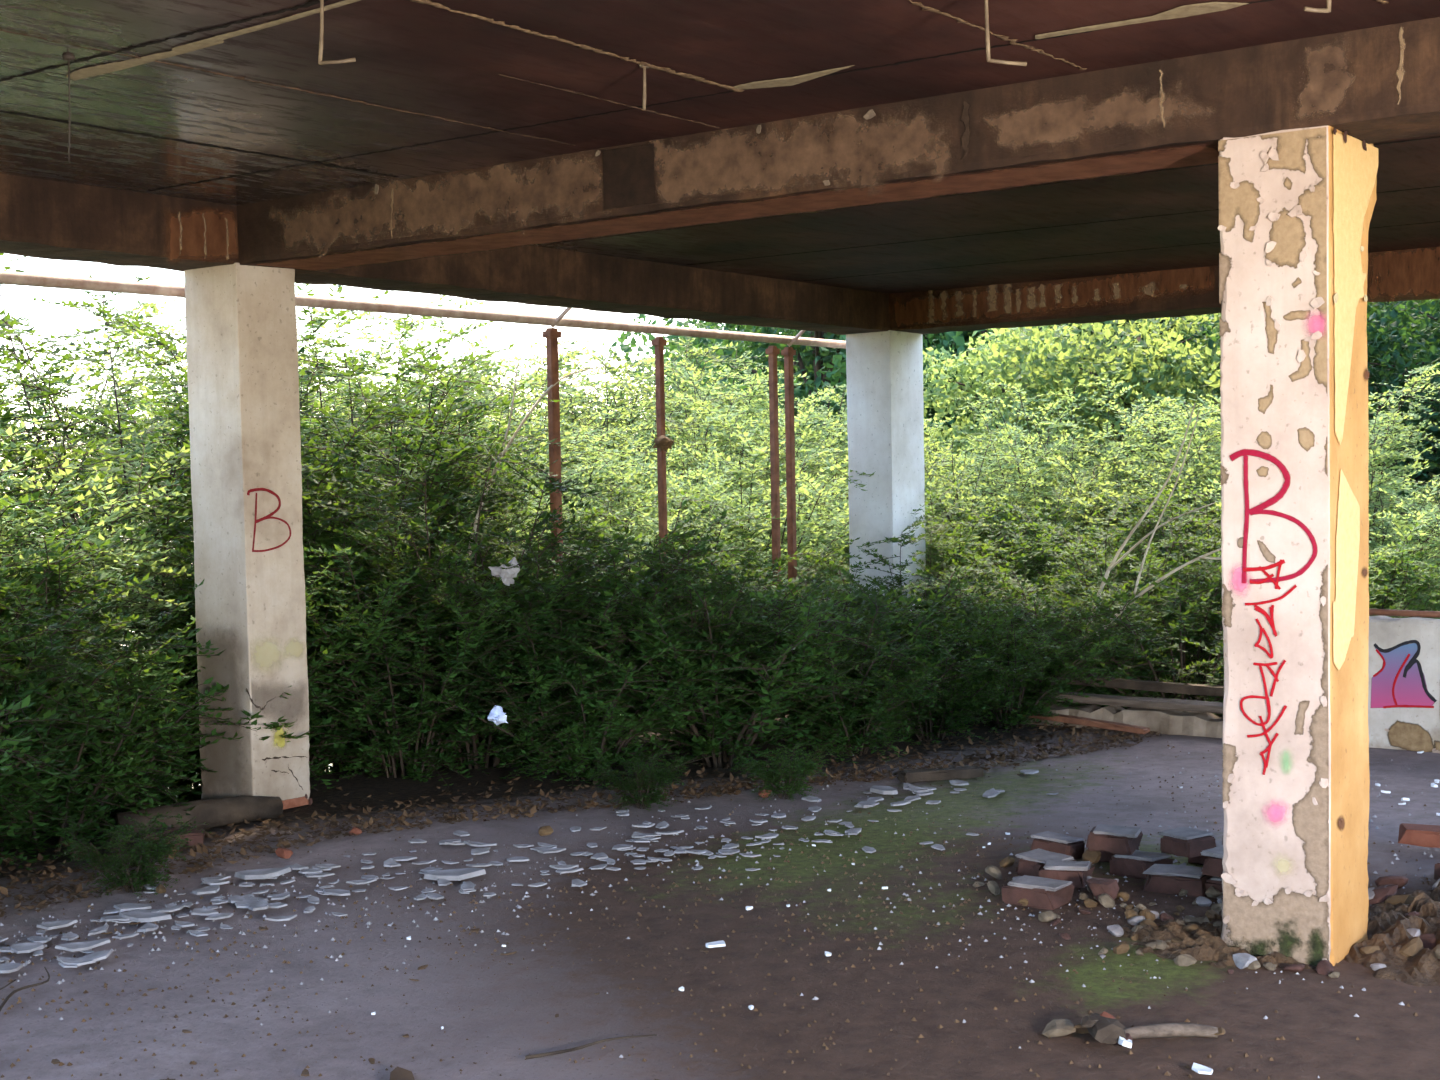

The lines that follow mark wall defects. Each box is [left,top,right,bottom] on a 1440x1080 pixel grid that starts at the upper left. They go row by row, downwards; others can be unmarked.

crack [0,0,749,192]
flaking render [269,91,951,258]
crack [818,23,1138,78]
flaking render [982,37,1378,965]